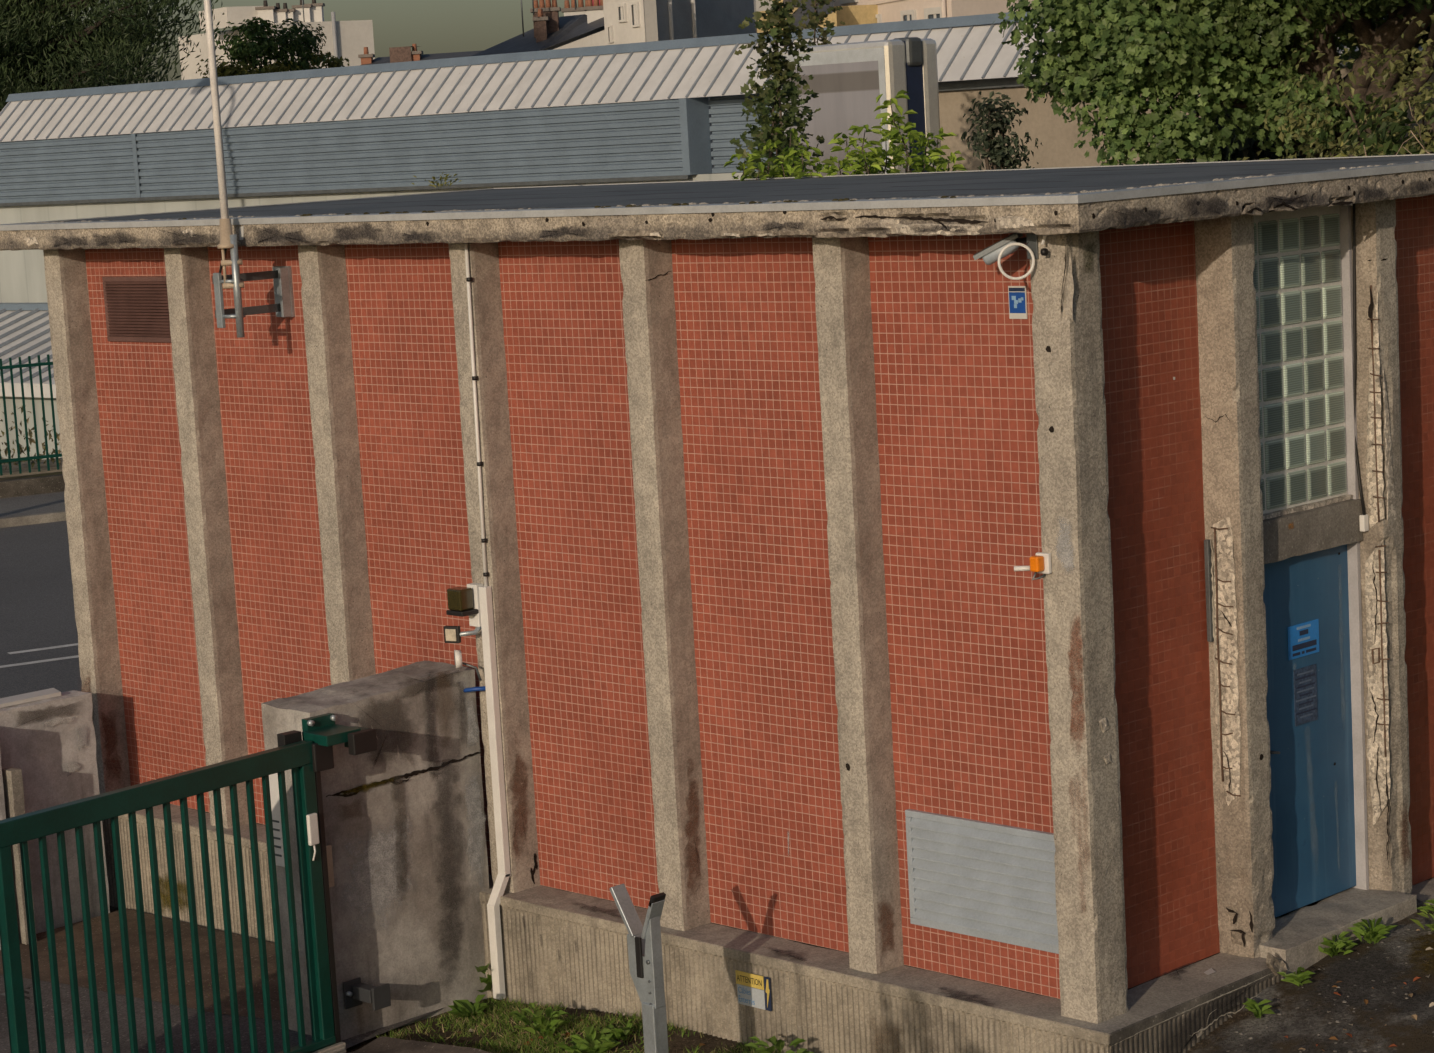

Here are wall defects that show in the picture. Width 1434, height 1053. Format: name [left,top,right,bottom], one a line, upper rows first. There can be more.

spalling [721,213,1075,238]
crack [326,752,481,797]
damp [361,673,485,959]
rust [1069,624,1084,736]
spalling [1210,517,1241,806]
spalling [1365,285,1396,865]